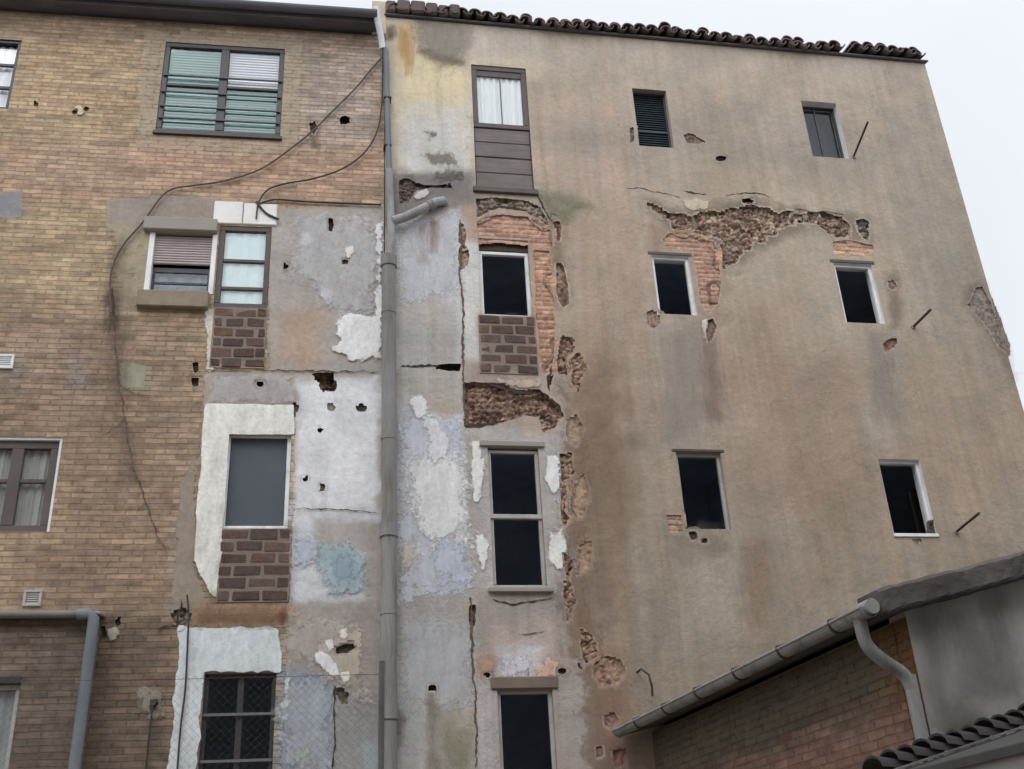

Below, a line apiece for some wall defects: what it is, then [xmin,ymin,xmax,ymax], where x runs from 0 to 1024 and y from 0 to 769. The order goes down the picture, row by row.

spalling [399,178,453,204]
peeling [292,215,384,362]
crack [458,220,469,419]
spalling [646,198,874,343]
spalling [967,286,1011,356]
crack [101,288,167,552]
peeling [396,210,592,720]
peeling [290,534,369,597]
peeling [276,624,368,769]
crack [469,597,478,768]
spalling [578,629,627,768]